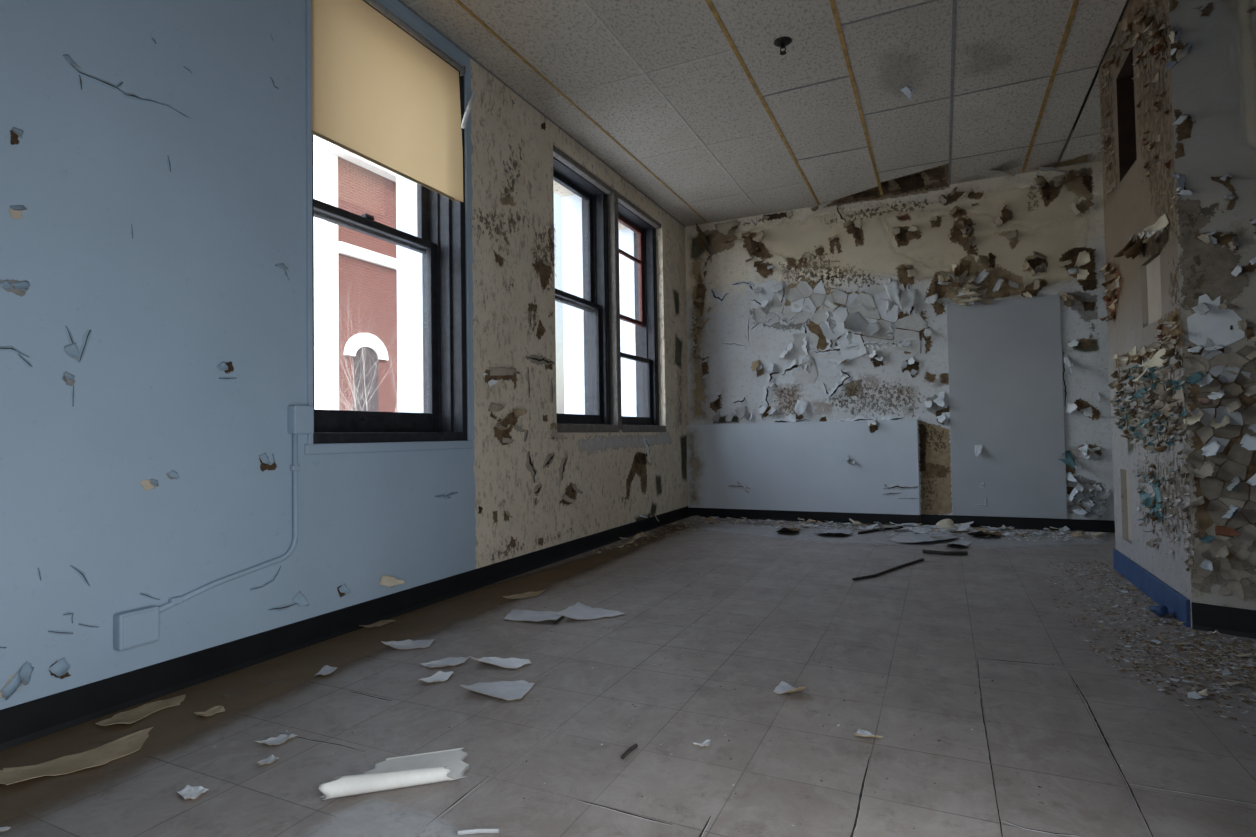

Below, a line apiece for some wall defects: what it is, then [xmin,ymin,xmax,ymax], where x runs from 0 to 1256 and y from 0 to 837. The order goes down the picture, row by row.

crack [63,54,190,118]
spalling [472,140,557,340]
spalling [693,0,1256,601]
peeling [0,346,33,367]
peeling [483,367,520,389]
peeling [488,402,527,446]
spalling [621,452,652,504]